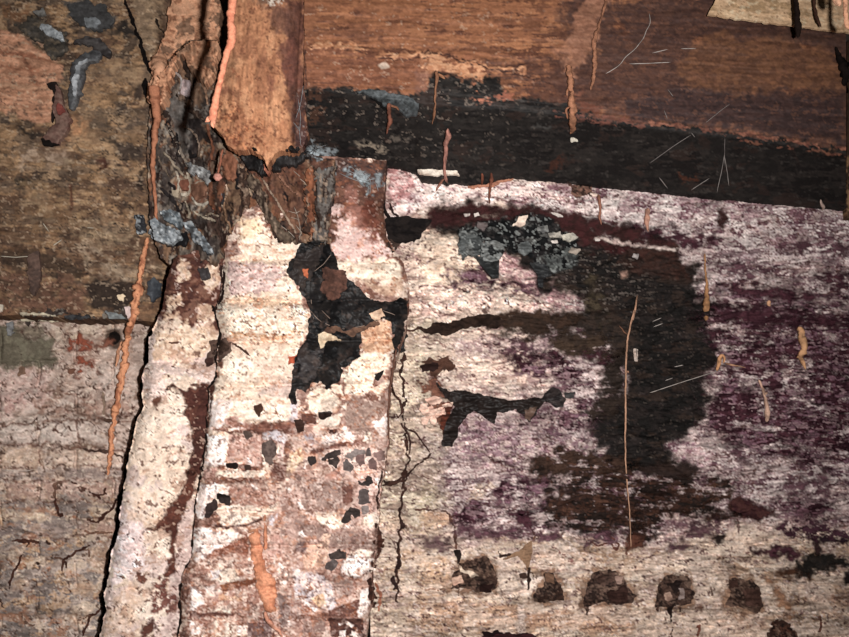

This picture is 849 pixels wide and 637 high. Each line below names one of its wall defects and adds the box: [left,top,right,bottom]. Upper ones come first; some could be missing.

peeling [14,0,115,147]
crack [124,0,165,100]
water stain [308,139,384,195]
peeling [517,225,581,288]
peeling [288,309,385,383]
spalling [416,356,456,431]
water stain [423,196,849,584]
crack [177,231,250,637]
crack [367,350,458,612]
spalling [446,536,569,606]
spalling [579,566,637,616]
spalling [653,571,702,637]